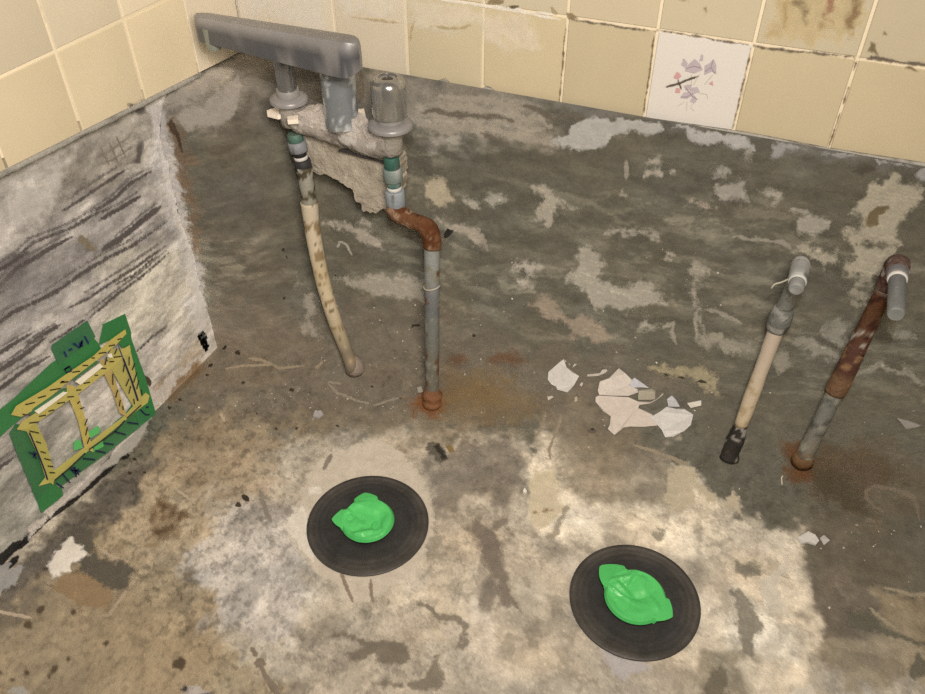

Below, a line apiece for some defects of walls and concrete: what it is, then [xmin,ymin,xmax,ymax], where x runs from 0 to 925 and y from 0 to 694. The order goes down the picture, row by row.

spalling [0,562,23,596]